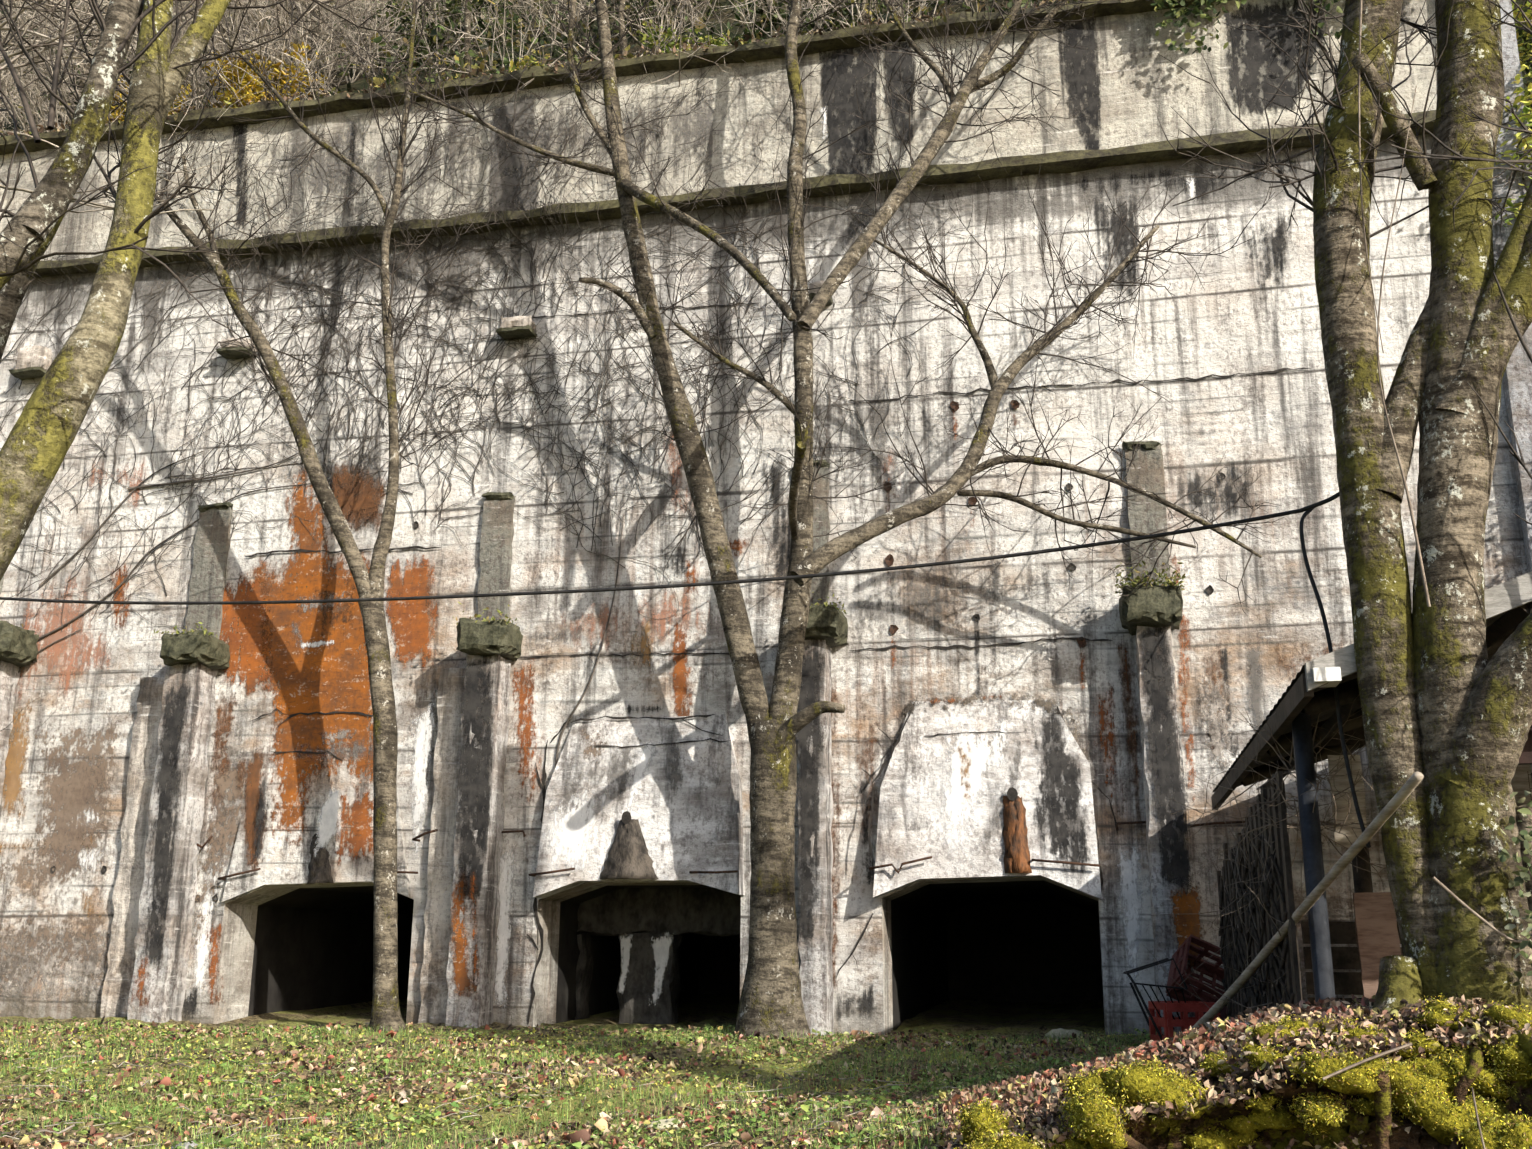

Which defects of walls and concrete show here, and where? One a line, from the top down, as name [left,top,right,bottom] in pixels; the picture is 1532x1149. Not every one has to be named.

water stain [819,40,916,175]
water stain [1058,18,1101,150]
water stain [1224,0,1326,129]
corrosion [729,539,747,556]
corrosion [18,565,130,697]
corrosion [209,464,438,873]
corrosion [570,561,717,717]
water stain [914,712,1089,873]
corrosion [1170,882,1206,967]